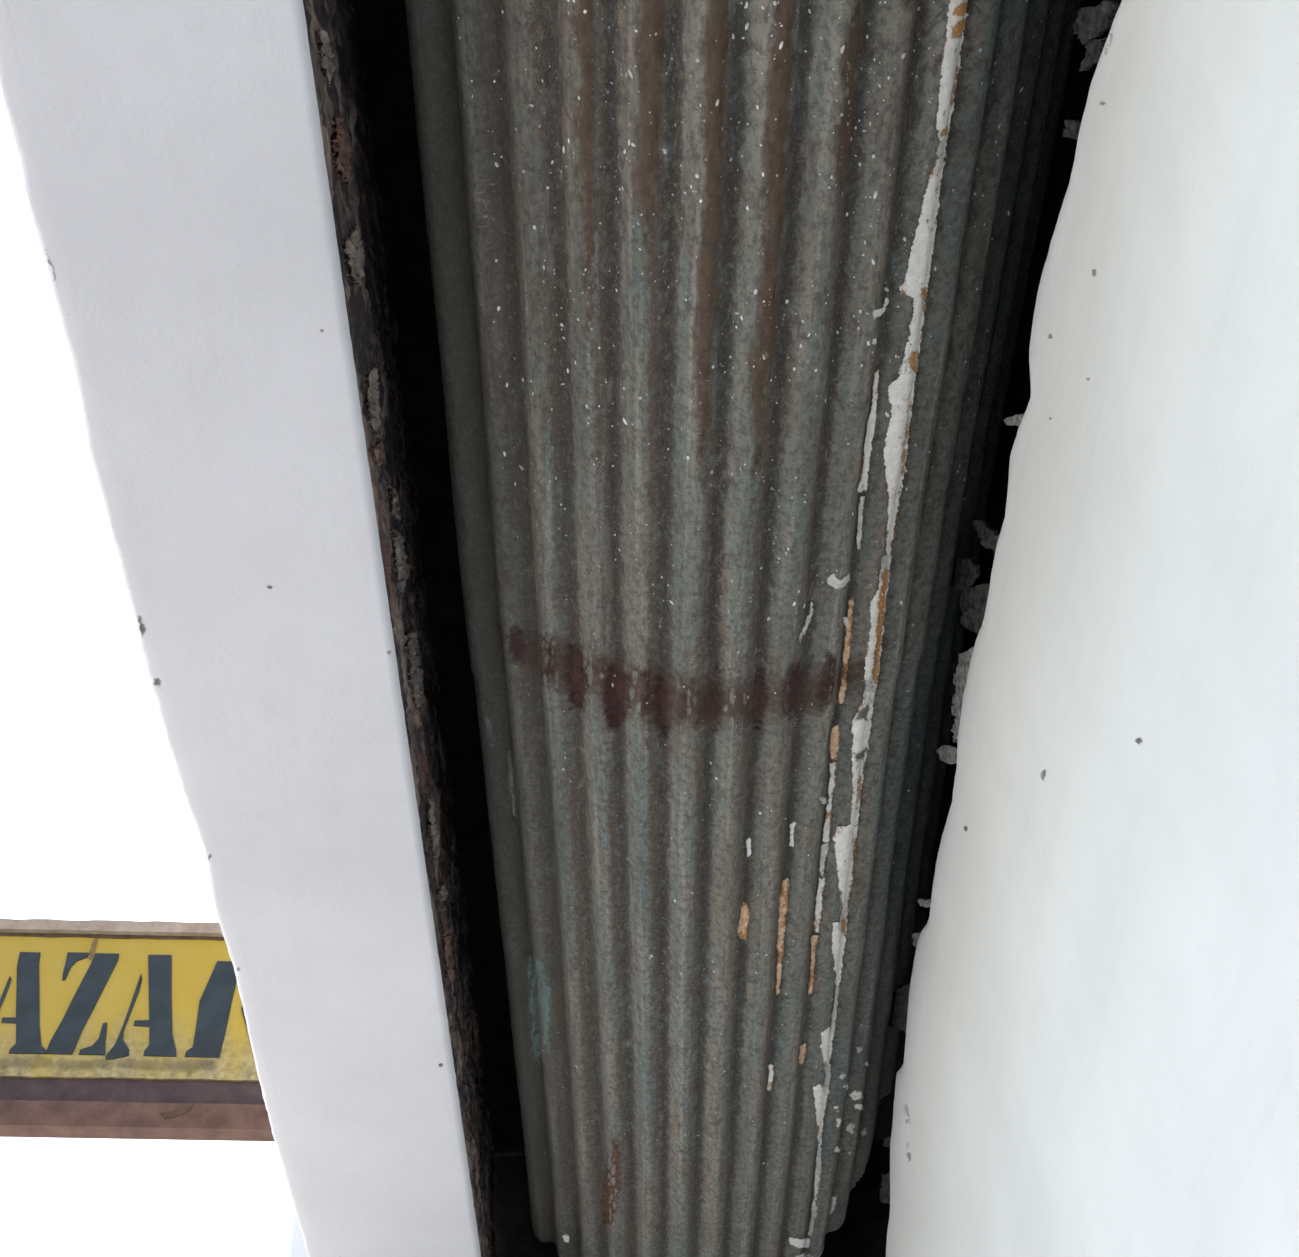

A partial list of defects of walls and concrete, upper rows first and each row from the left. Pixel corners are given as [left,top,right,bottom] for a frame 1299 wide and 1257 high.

spalling [315,27,336,87]
spalling [340,226,366,289]
rust [575,0,594,320]
rust [635,0,664,246]
rust [695,0,728,458]
rust [751,0,797,474]
rust [836,1,861,187]
spalling [362,367,385,467]
spalling [386,485,411,597]
spalling [387,628,424,713]
peeling [798,0,968,1236]